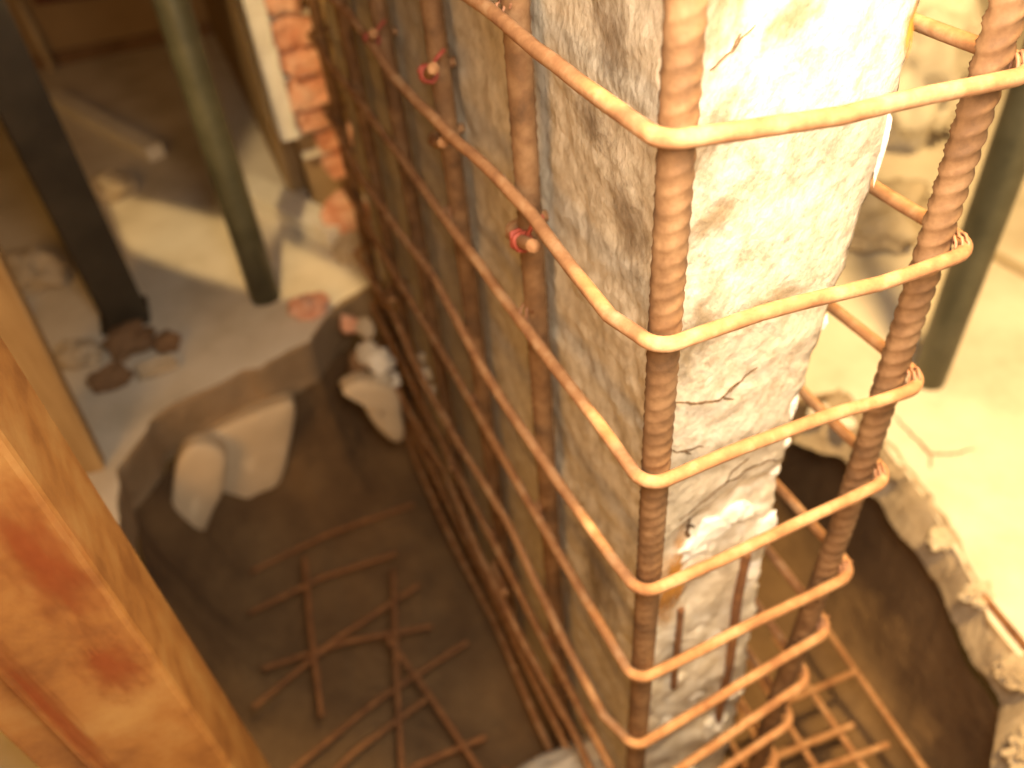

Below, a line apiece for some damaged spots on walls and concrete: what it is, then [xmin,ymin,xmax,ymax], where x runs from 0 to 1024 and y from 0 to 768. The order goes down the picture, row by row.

spalling [264,0,480,579]
spalling [419,0,521,665]
spalling [503,32,542,215]
spalling [517,210,570,748]
spalling [641,350,680,475]
spalling [647,148,697,336]
spalling [657,0,709,128]
spalling [873,113,893,188]
spalling [869,271,941,397]
spalling [909,90,1002,266]
spalling [967,0,1024,78]
spalling [626,402,1024,768]